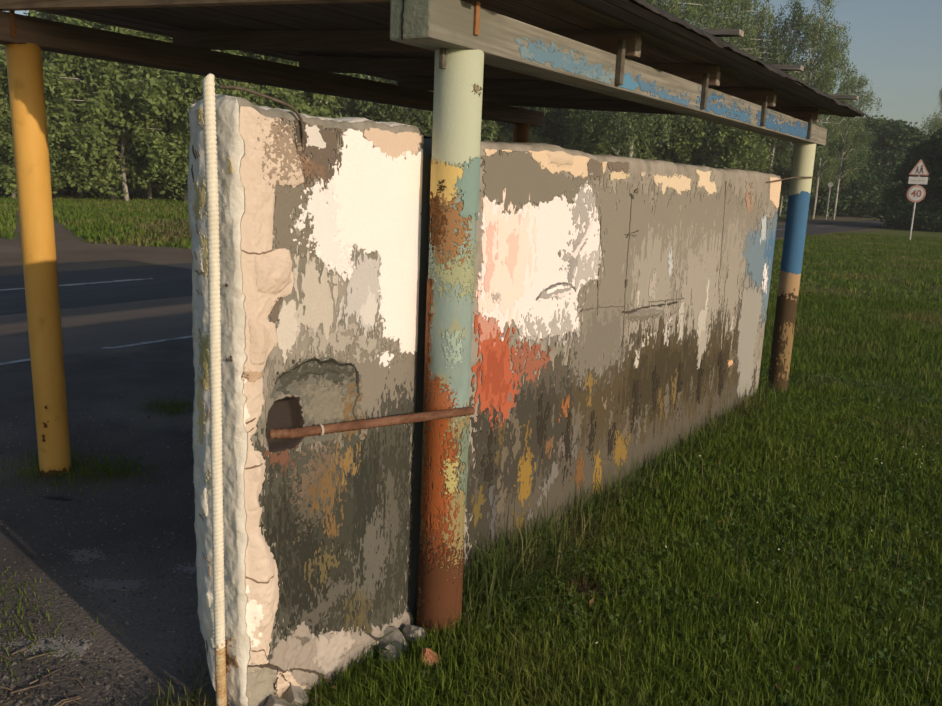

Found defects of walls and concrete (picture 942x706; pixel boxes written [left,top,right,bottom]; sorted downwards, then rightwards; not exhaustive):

peeling [265,48,604,453]
corrosion [428,179,472,270]
peeling [515,36,816,328]
corrosion [768,269,801,392]
peeling [241,374,250,428]
water stain [242,149,769,660]
corrosion [261,275,475,640]
corrosion [471,485,486,528]
peeling [245,585,264,648]
spalling [229,655,311,706]
peeling [295,627,356,675]